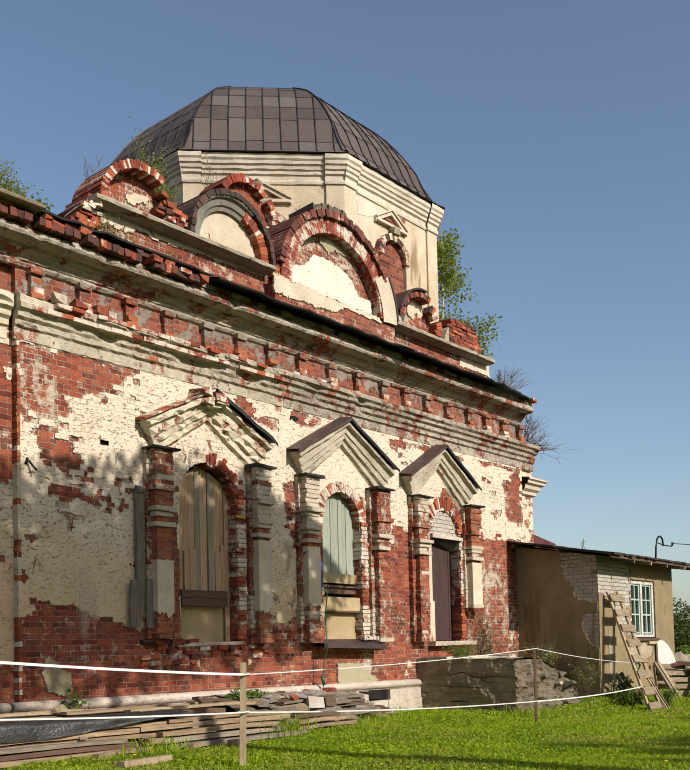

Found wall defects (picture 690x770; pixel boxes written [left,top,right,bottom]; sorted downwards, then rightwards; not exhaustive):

spalling [0,333,145,531]
spalling [281,480,296,548]
spalling [477,460,522,527]
spalling [0,512,520,704]
spalling [560,552,631,649]